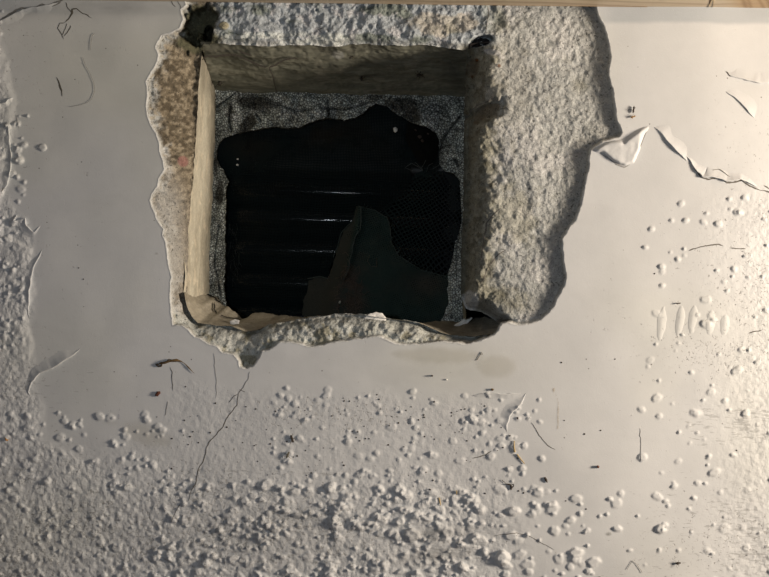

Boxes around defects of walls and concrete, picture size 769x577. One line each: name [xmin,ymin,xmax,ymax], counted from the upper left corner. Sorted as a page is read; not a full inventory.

spalling [145,1,687,370]
crack [686,156,769,193]
crack [171,356,250,522]